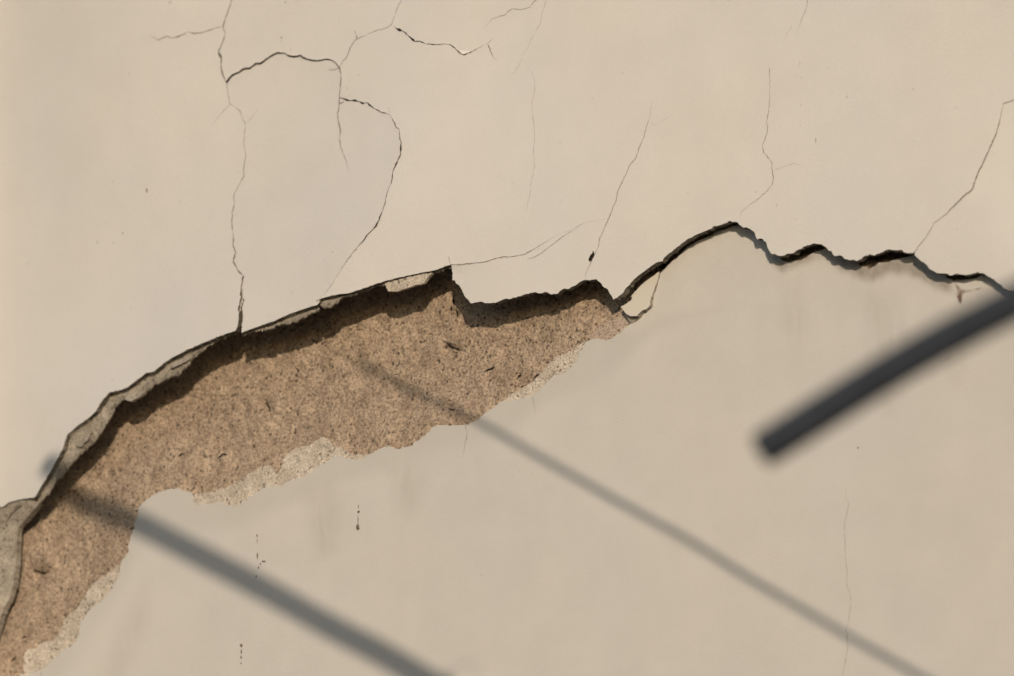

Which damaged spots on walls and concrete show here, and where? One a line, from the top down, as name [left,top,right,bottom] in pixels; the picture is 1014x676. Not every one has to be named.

crack [148,0,546,285]
crack [448,103,664,279]
crack [654,68,799,291]
crack [783,244,826,262]
crack [860,100,1013,269]
crack [947,272,981,280]
flaking render [0,266,659,676]